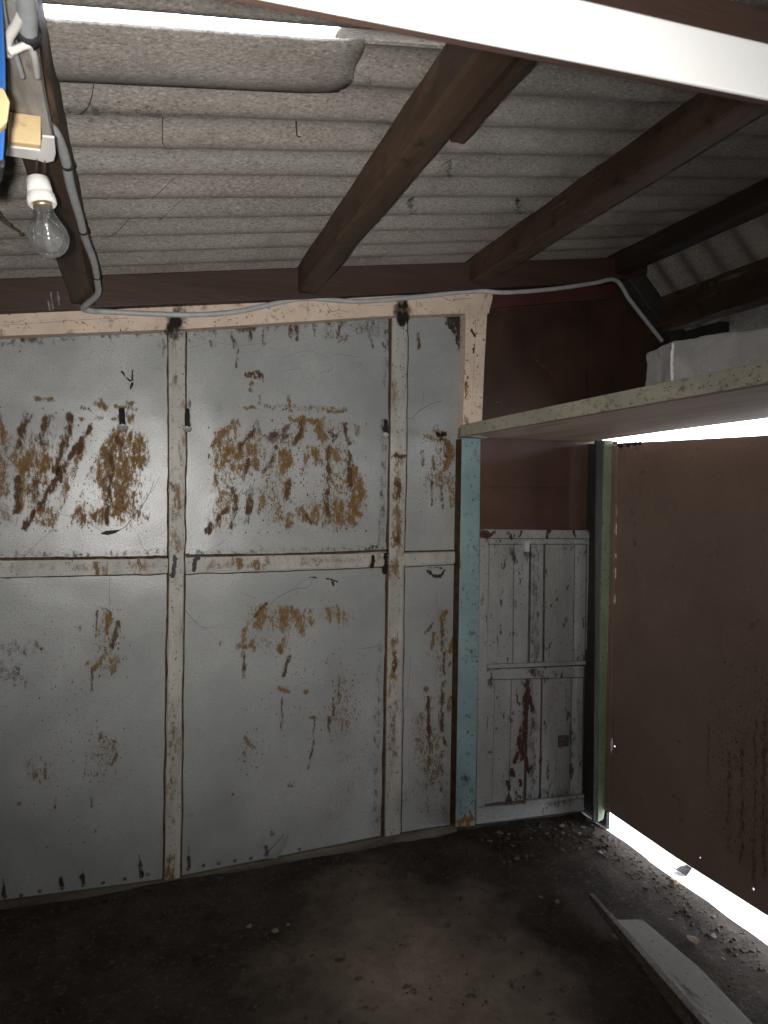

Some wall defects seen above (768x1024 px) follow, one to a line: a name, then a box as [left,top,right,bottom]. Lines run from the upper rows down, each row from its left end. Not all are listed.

rust [0,396,150,532]
rust [204,394,367,535]
rust [17,606,131,813]
rust [234,590,368,775]
rust [408,428,476,827]